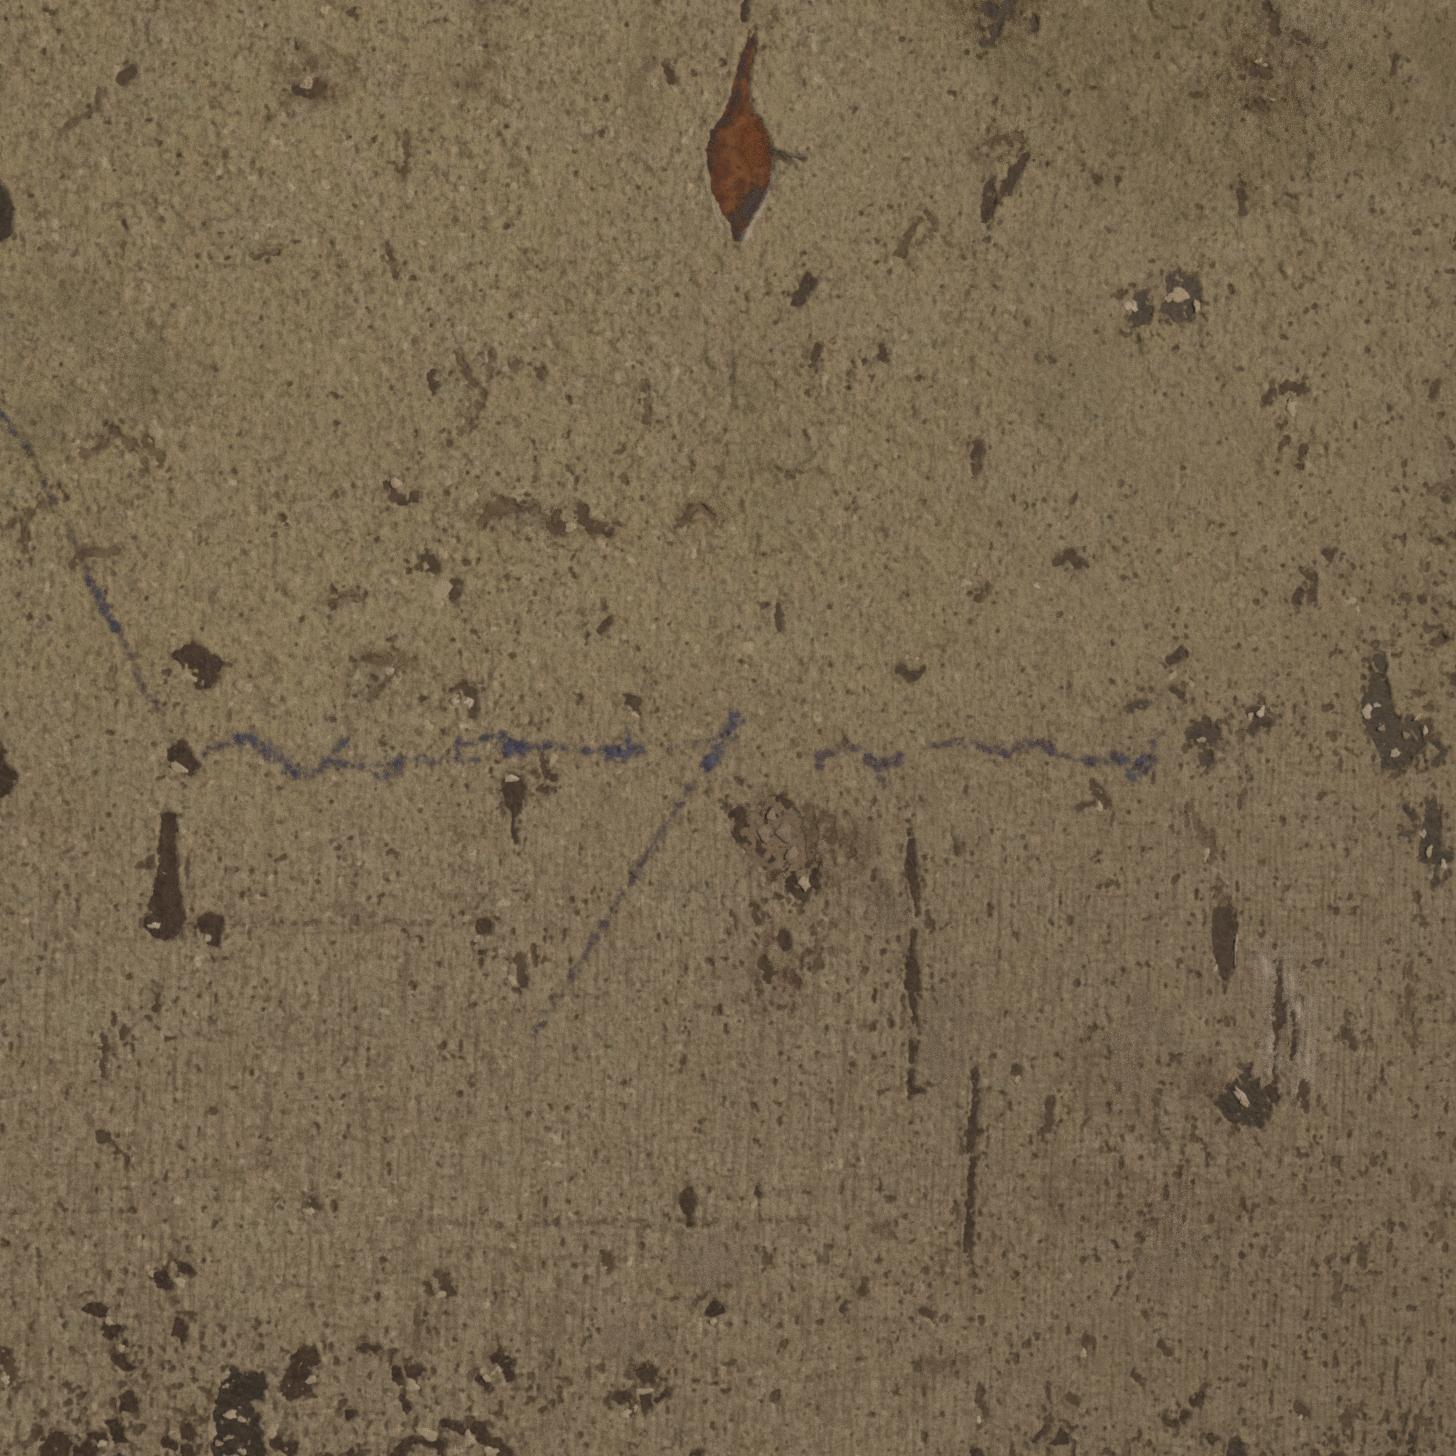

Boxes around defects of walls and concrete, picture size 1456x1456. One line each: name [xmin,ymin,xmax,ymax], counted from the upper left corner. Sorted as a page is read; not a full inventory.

peeling [1361,653,1445,770]
peeling [1213,1068,1278,1129]
crack [963,1066,981,1258]
peeling [147,1259,193,1291]
peeling [432,1270,456,1299]
peeling [171,1317,188,1343]
spalling [704,1300,726,1326]
peeling [0,1346,17,1385]
peeling [38,1302,138,1456]
peeling [355,1343,515,1456]
peeling [611,1364,668,1418]
peeling [1162,1392,1203,1428]